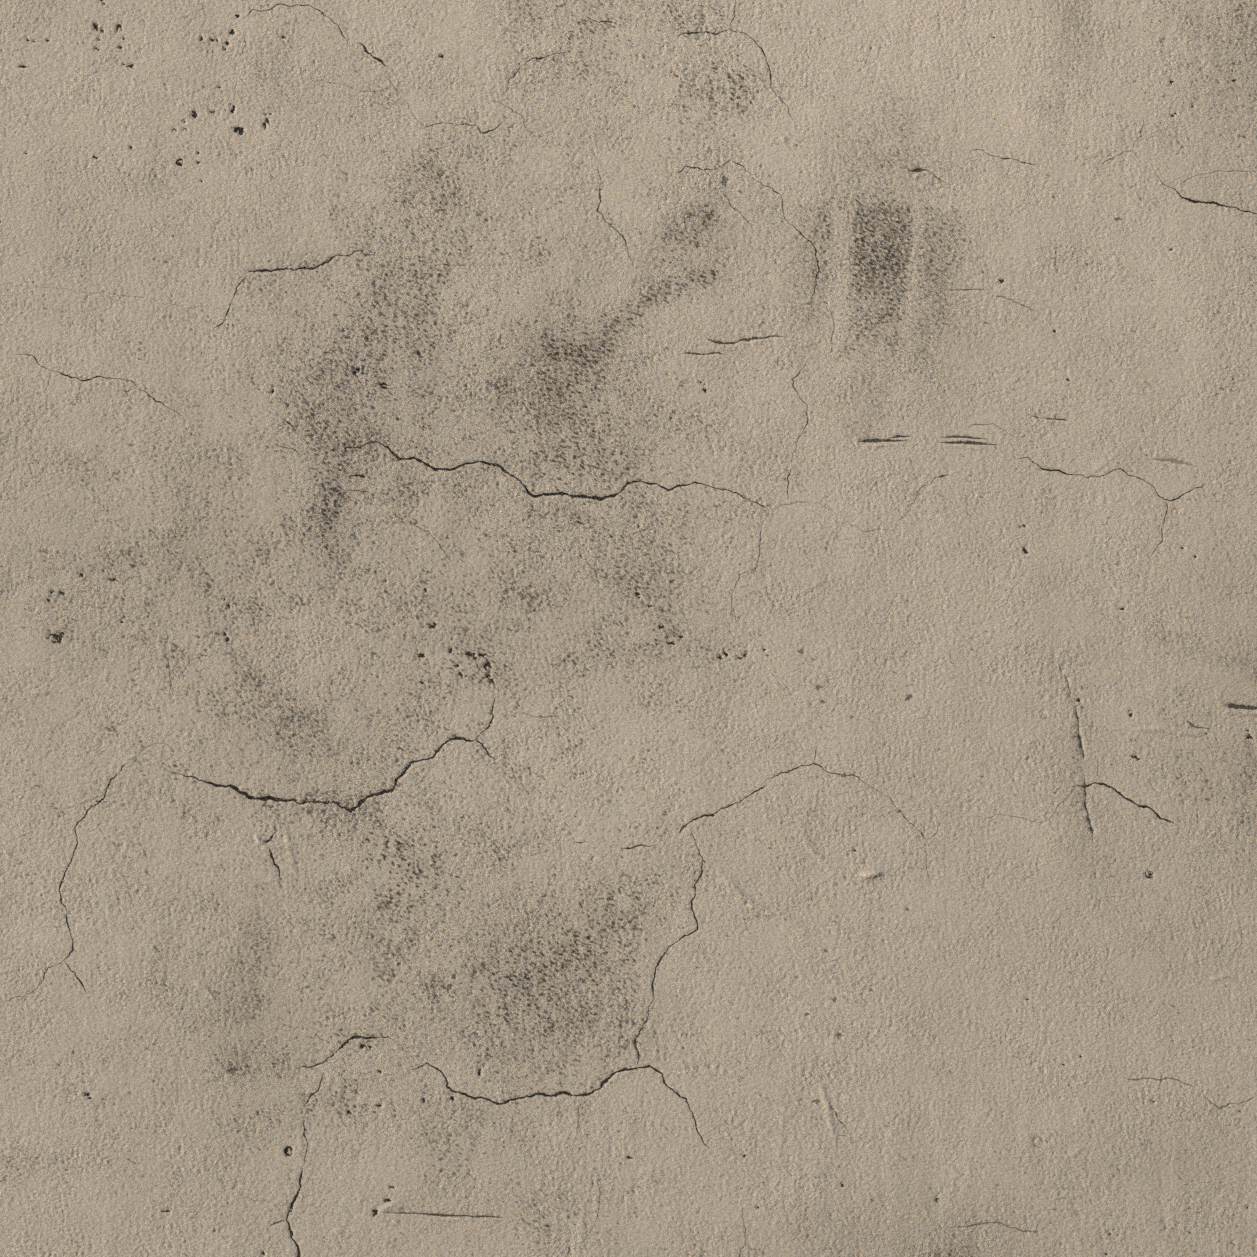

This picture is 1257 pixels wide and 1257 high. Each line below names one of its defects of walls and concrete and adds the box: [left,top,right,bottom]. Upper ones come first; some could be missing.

water stain [854,200,910,284]
water stain [306,437,346,555]
water stain [517,272,714,490]
crack [341,159,947,622]
crack [969,423,1203,556]
crack [3,698,553,1004]
crack [412,747,952,1148]
crack [990,761,1174,824]
crack [247,1035,398,1257]
crack [950,1221,1038,1233]